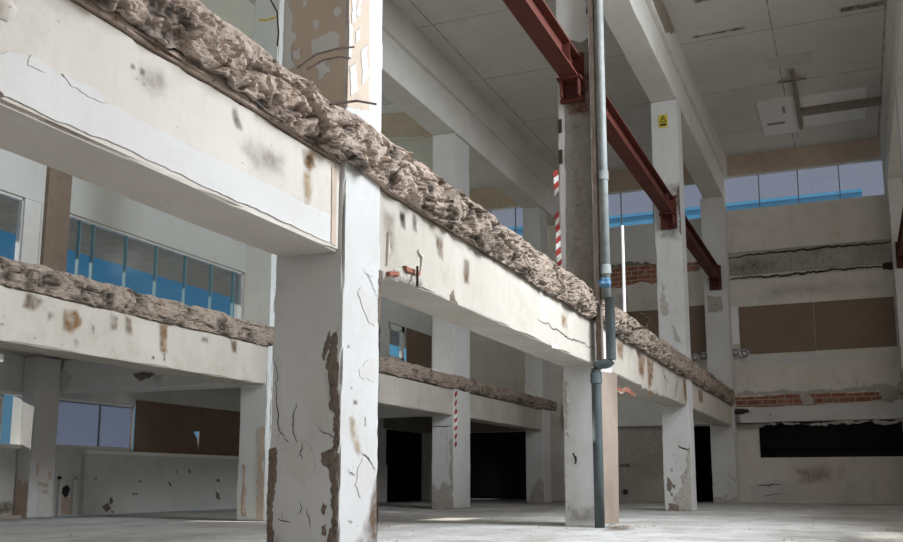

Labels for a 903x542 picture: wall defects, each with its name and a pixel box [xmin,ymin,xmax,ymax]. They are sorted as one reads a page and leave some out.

spalling [0,0,903,407]
crack [729,241,891,280]
spalling [0,256,340,542]
crack [275,364,303,460]
peeling [355,457,374,498]
spalling [358,265,570,437]